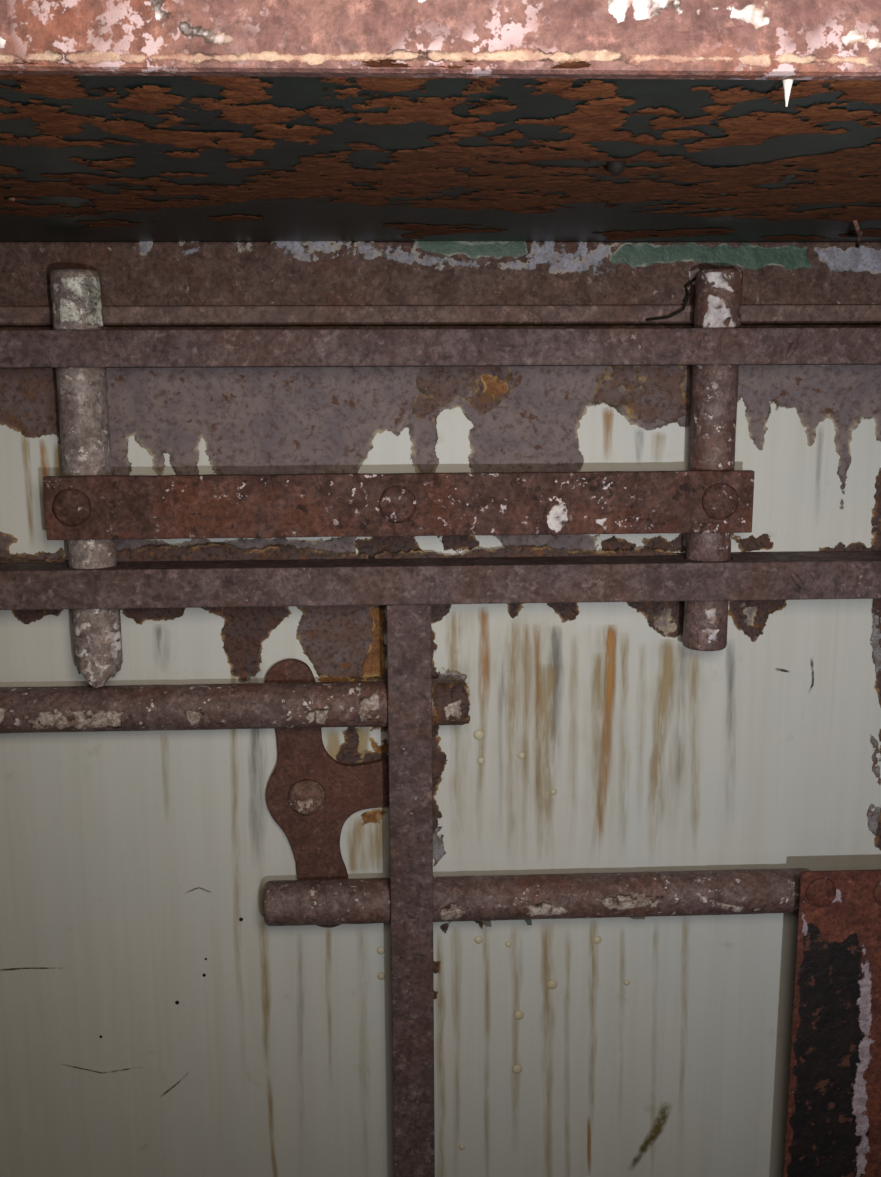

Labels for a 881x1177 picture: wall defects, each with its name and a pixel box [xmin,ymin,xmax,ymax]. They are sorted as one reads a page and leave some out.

peeling [0,0,881,175]
rust [0,135,881,241]
peeling [0,368,61,444]
peeling [106,365,692,475]
peeling [737,365,881,509]
rust [431,628,471,866]
rust [481,611,489,684]
rust [512,631,559,749]
rust [596,628,625,787]
peeling [701,600,787,642]
peeling [787,905,875,1177]
rust [633,1108,667,1165]